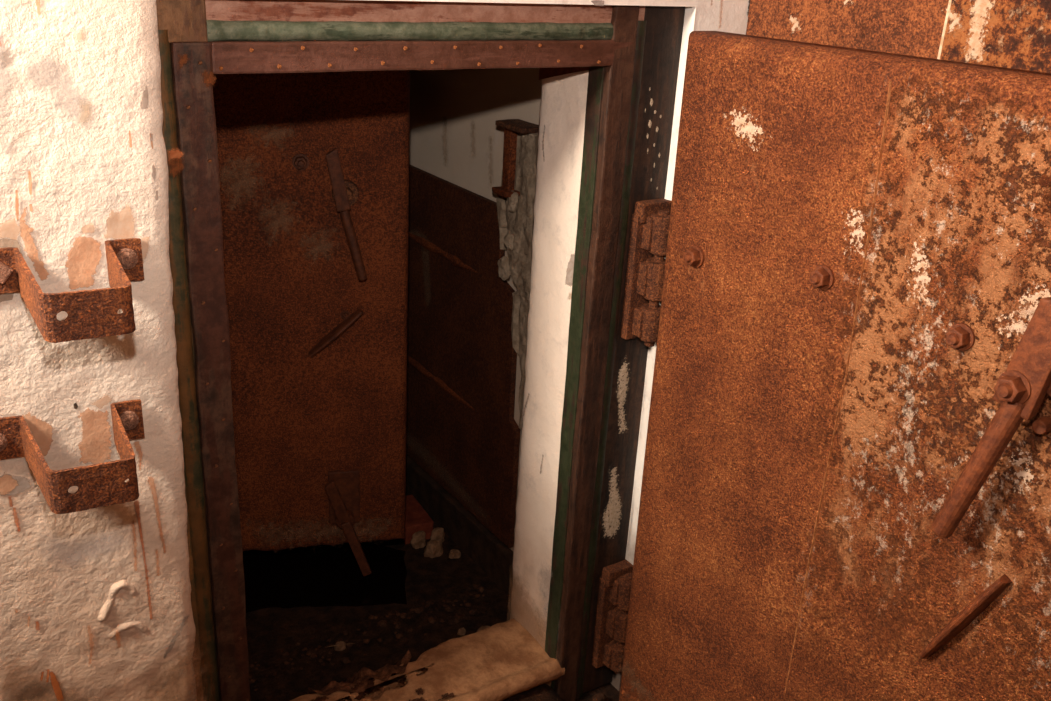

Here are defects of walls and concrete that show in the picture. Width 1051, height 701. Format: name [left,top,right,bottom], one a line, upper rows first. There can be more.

peeling [0,207,49,281]
peeling [65,204,149,290]
spalling [496,132,538,430]
peeling [74,395,111,464]
rust [133,441,166,620]
rust [41,669,64,701]